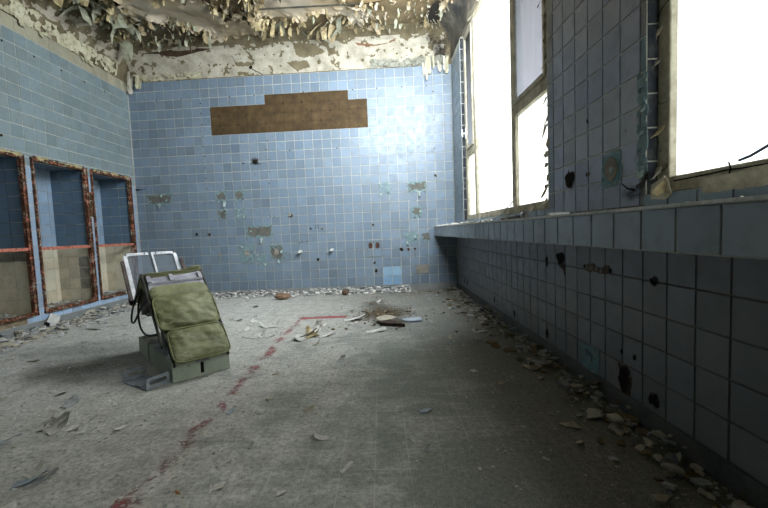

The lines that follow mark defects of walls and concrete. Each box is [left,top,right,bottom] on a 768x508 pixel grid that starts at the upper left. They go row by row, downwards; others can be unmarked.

peeling [22,0,453,94]
peeling [210,90,368,136]
peeling [531,0,549,210]
peeling [636,60,672,200]
peeling [407,181,428,218]
spalling [564,170,574,188]
peeling [700,164,768,193]
peeling [245,224,286,263]
spalling [618,349,636,397]